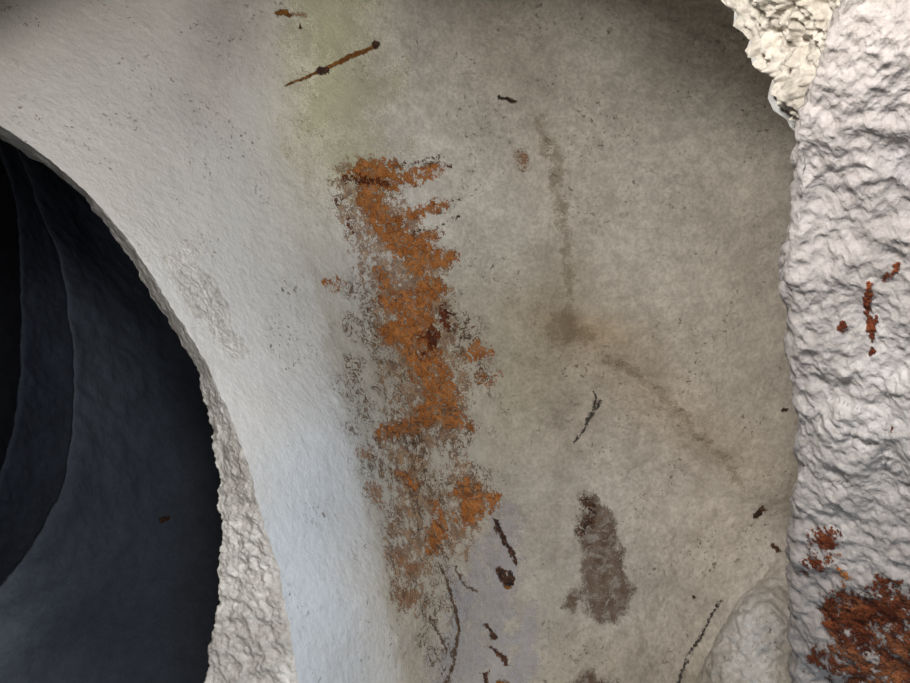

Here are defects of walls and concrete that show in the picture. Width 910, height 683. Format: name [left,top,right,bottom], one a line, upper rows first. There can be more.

rust [274,9,307,29]
rust [285,40,380,86]
spalling [162,243,250,359]
rust [862,262,901,356]
rust [327,153,503,619]
leakage [560,491,637,625]
rust [798,524,910,683]
leakage [576,669,619,683]